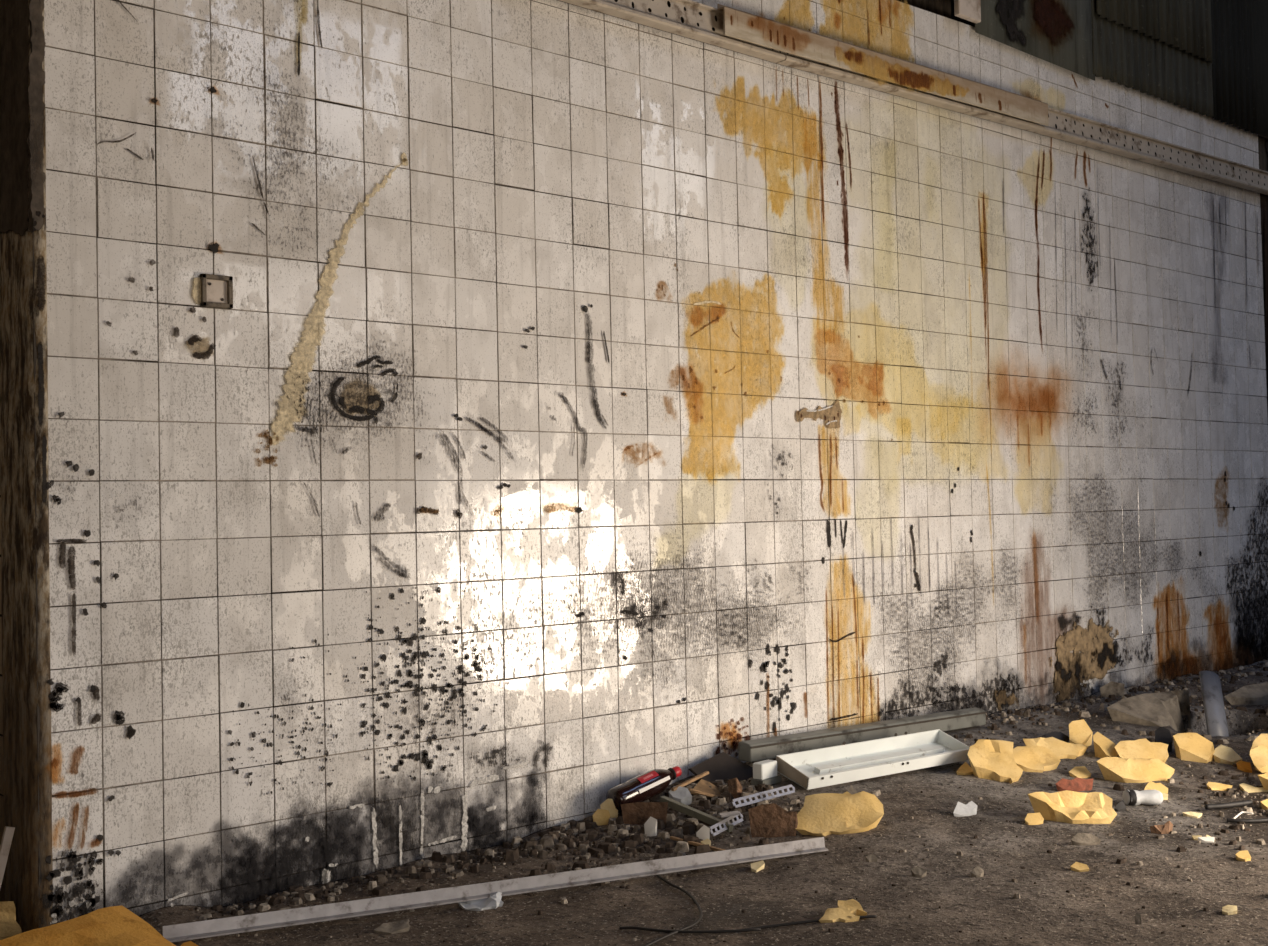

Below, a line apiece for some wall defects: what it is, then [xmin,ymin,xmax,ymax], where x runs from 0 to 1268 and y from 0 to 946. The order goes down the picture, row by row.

corrosion [846,0,891,62]
corrosion [890,70,932,88]
corrosion [776,74,852,271]
corrosion [979,195,989,388]
corrosion [819,437,848,564]
damp [569,554,808,737]
corrosion [826,577,879,722]
damp [864,477,1268,720]
spalling [1051,613,1119,701]
corrosion [1157,594,1180,655]
damp [116,558,553,917]